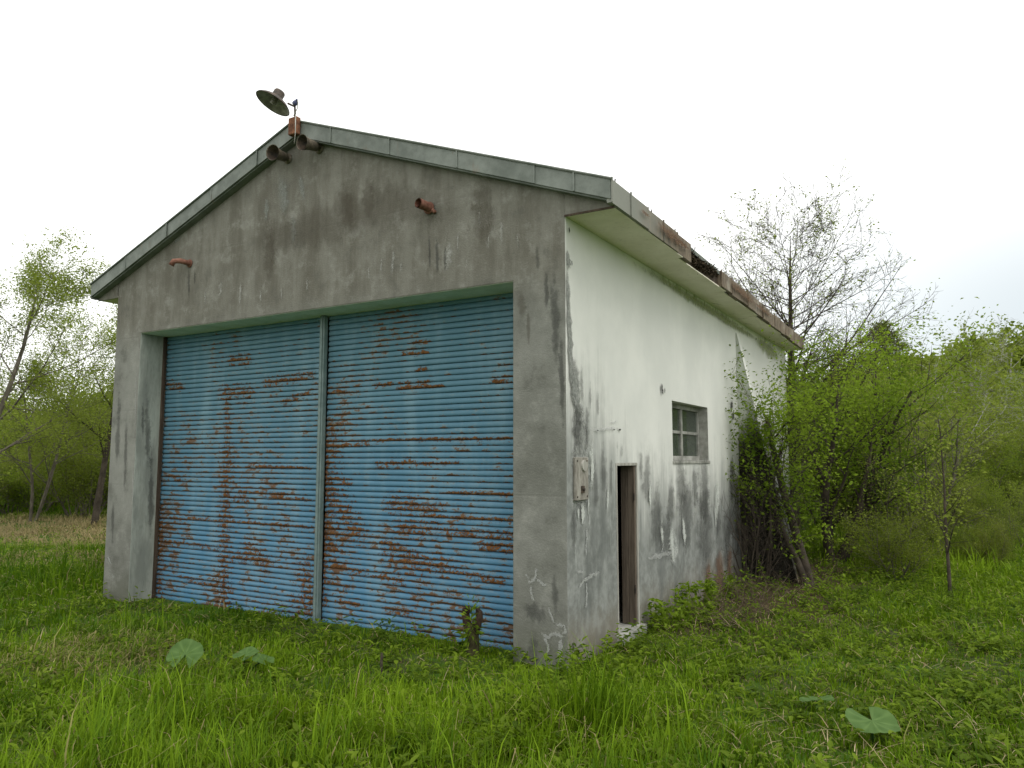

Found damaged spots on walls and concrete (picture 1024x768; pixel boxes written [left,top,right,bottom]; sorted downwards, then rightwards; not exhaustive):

rust [660,224,689,249]
rust [226,352,255,368]
rust [374,340,445,393]
rust [156,371,316,608]
rust [286,418,513,621]